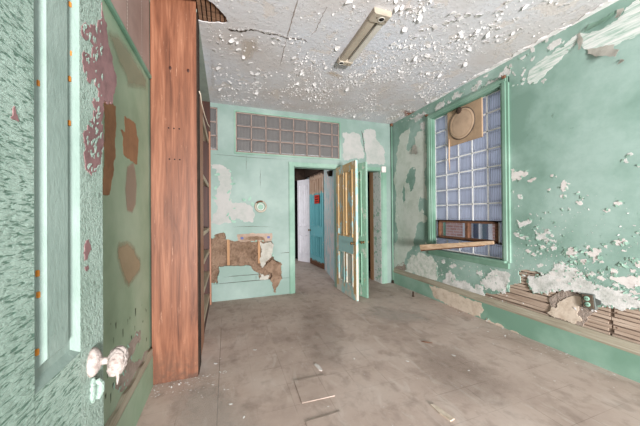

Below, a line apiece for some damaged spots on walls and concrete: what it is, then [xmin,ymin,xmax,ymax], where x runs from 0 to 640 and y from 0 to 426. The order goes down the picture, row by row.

peeling [81,3,139,196]
crack [228,0,327,62]
peeling [196,0,640,344]